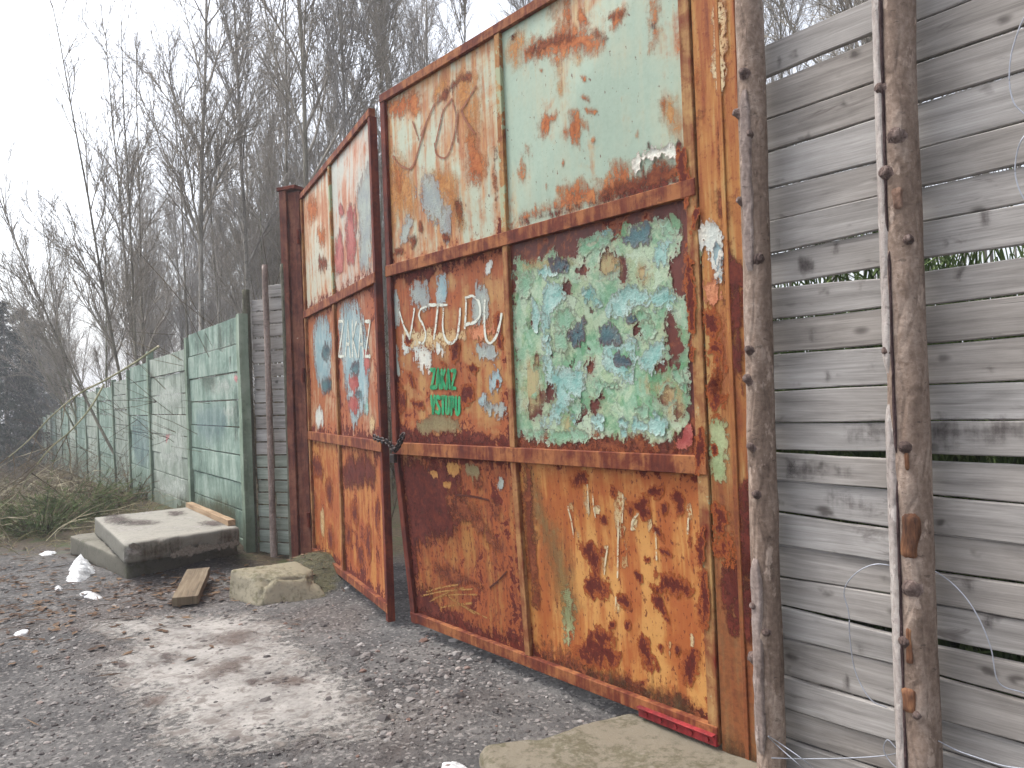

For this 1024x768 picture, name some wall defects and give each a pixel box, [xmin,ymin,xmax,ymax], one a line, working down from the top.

rust [508,0,624,72]
rust [389,153,423,255]
rust [433,72,498,242]
rust [563,95,598,145]
rust [519,160,679,225]
peeling [631,139,692,182]
peeling [313,297,375,433]
peeling [394,195,730,484]
rust [722,248,744,395]
rust [312,451,380,568]
rust [401,457,516,643]
rust [720,479,752,643]